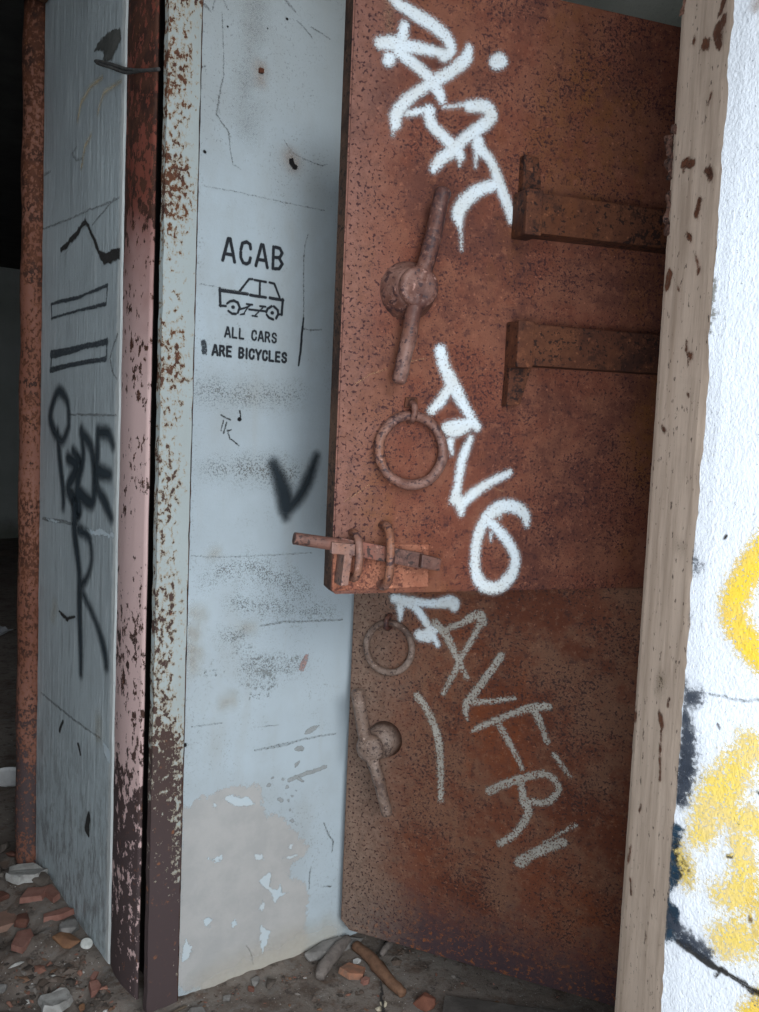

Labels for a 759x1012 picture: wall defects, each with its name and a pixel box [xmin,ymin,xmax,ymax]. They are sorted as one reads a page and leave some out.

corrosion [680,157,713,181]
corrosion [665,268,679,292]
corrosion [658,698,670,781]
peeling [178,746,333,992]